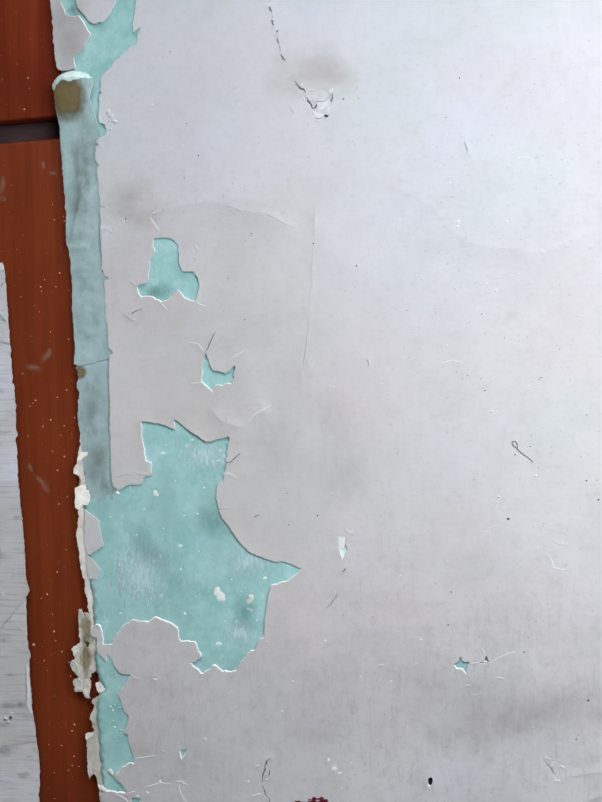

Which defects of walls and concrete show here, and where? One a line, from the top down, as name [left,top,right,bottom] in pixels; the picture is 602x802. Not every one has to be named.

crack [258,0,286,61]
crack [288,81,330,126]
flaking render [310,88,333,119]
peeling [52,0,301,802]
crack [246,750,274,802]